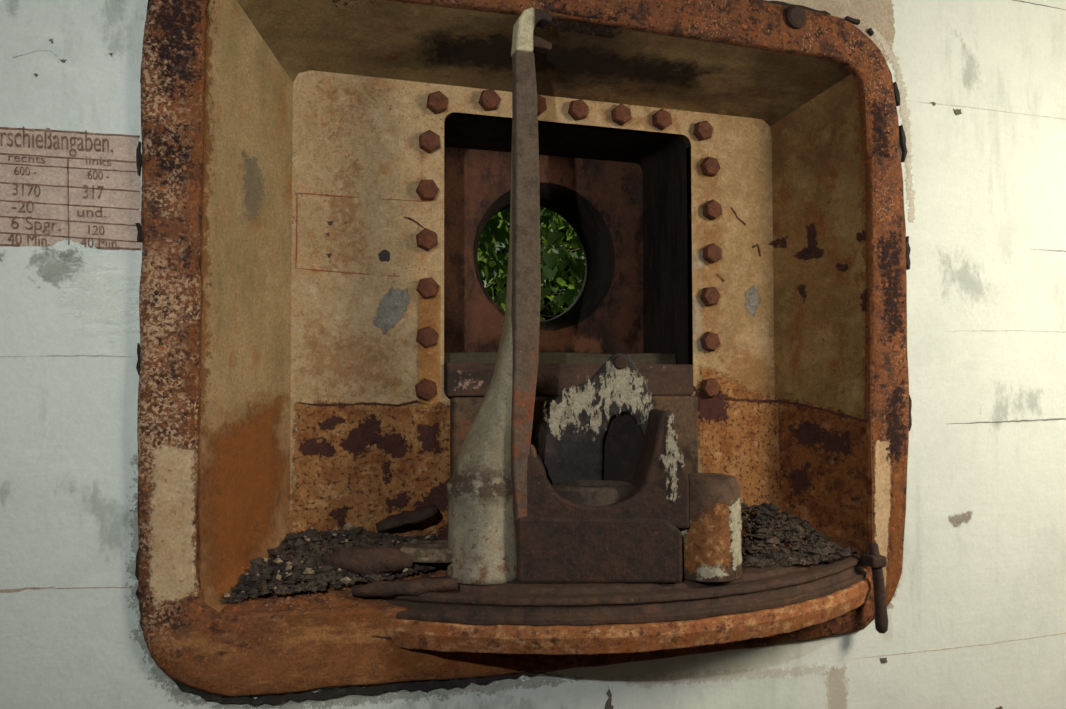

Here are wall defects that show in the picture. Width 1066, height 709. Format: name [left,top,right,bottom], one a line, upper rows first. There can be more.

rust [545,0,627,38]
rust [142,0,217,437]
rust [378,249,390,262]
rust [678,94,907,608]
rust [287,399,450,547]
rust [378,639,544,676]